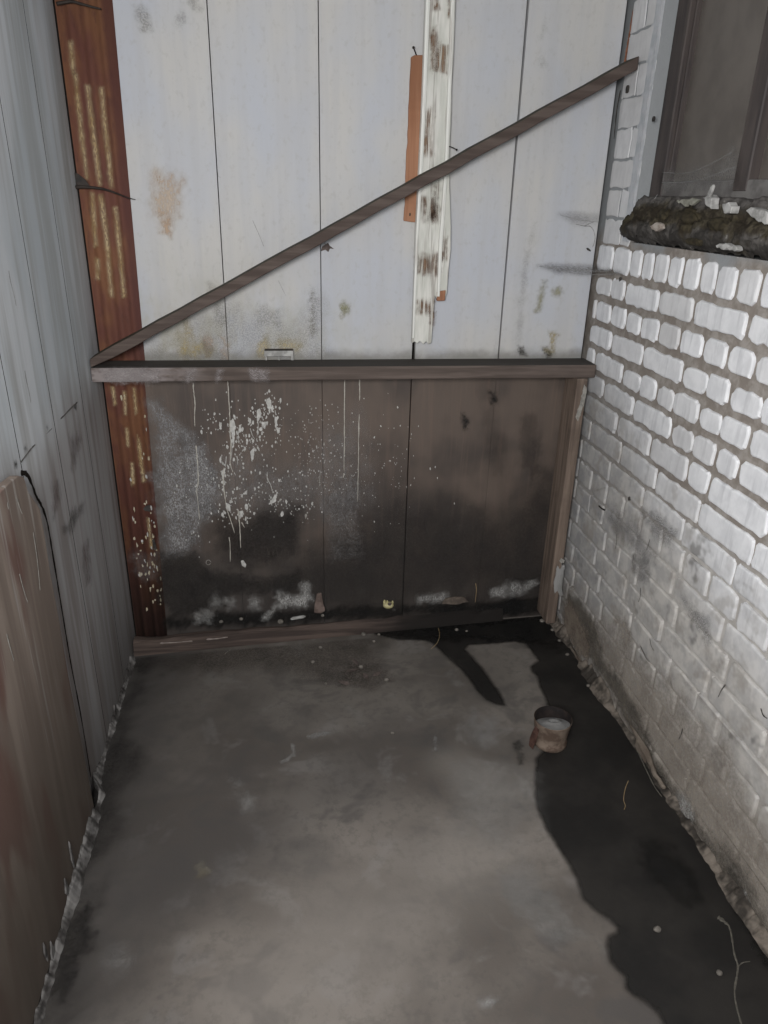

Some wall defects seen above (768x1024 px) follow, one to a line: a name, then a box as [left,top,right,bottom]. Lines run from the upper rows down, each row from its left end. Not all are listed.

leakage [148,403,768,1024]